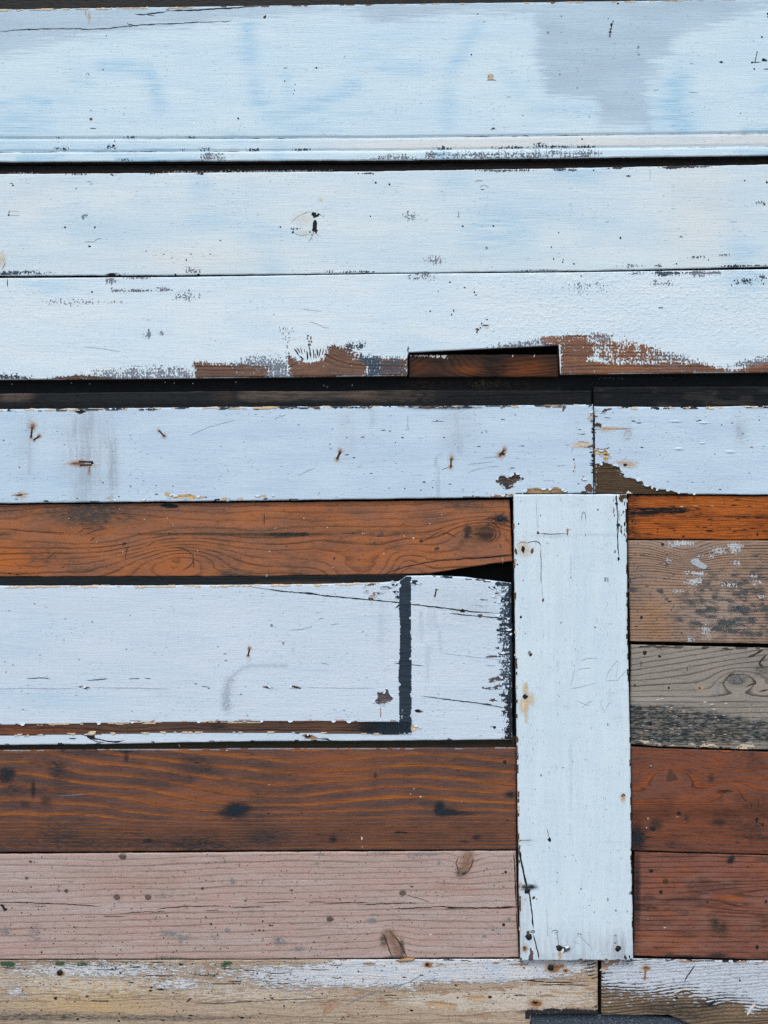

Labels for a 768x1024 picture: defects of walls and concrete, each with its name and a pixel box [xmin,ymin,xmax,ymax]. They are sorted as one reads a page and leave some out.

crack [1,6,257,32]
peeling [47,327,408,380]
peeling [486,332,768,375]
peeling [463,404,696,542]
crack [254,587,507,620]
peeling [371,683,412,707]
peeling [466,579,531,773]